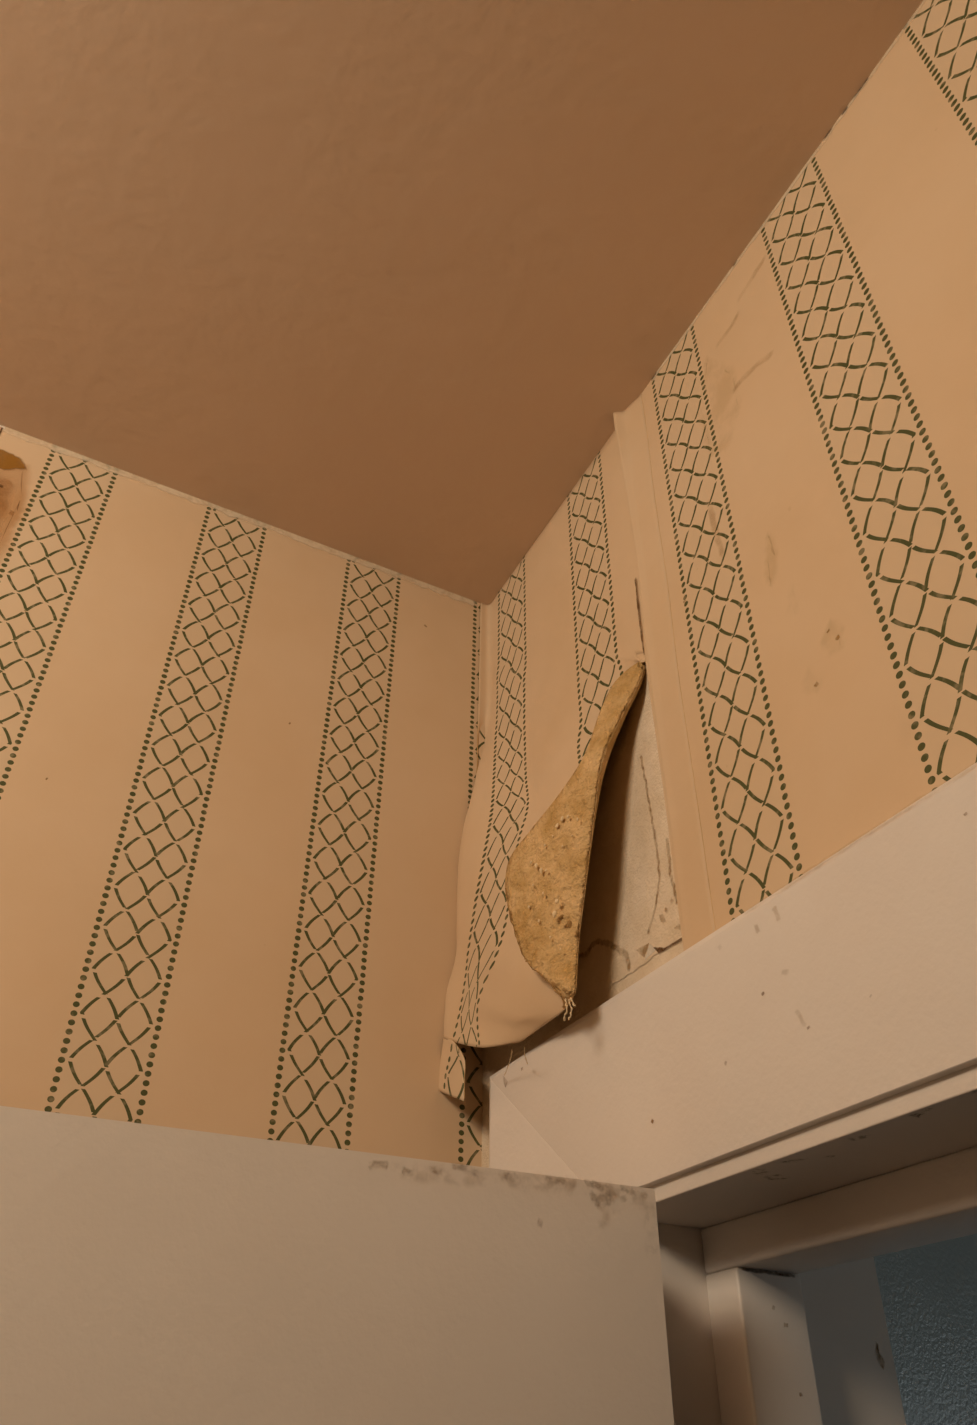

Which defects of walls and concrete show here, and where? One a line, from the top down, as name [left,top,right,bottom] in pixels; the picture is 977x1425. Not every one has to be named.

damp [0,449,25,487]
flaking render [482,663,682,1069]